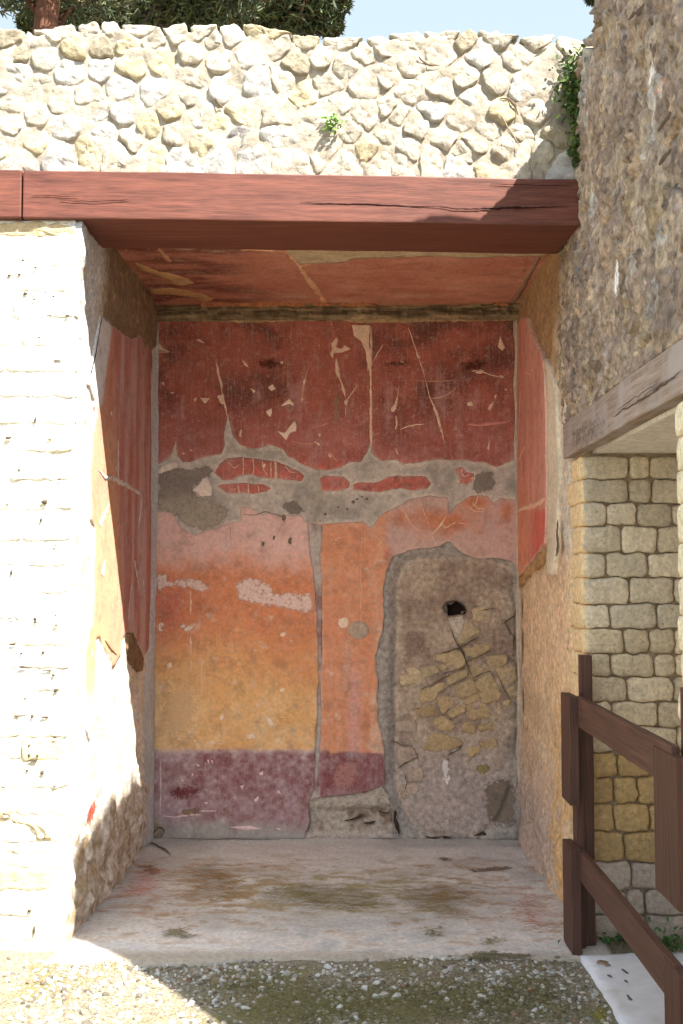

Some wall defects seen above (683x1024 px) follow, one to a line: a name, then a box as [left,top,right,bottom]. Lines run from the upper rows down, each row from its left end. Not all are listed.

flaking render [41,221,213,948]
flaking render [157,415,516,535]
flaking render [287,250,575,902]
crack [418,608,516,709]